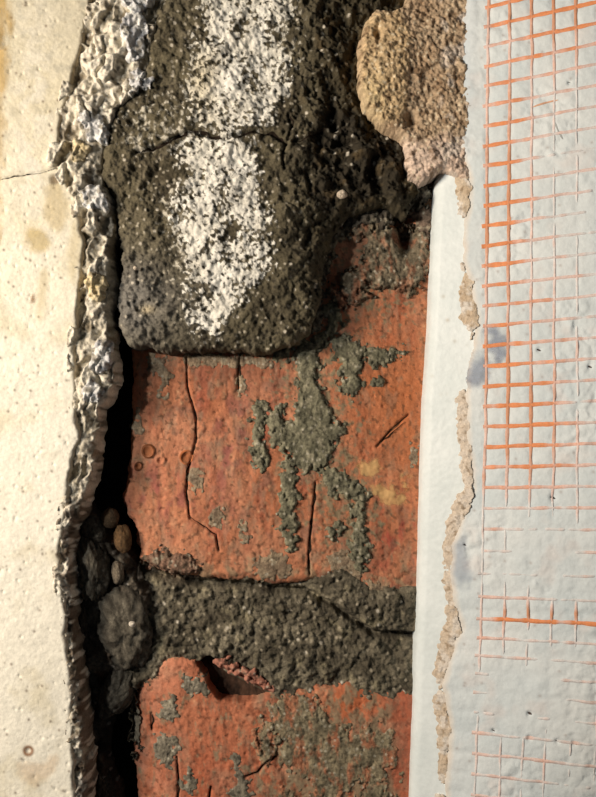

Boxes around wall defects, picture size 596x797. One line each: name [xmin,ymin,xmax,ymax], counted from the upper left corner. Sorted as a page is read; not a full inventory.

efflorescence [117,0,304,341]
peeling [455,177,473,218]
peeling [458,262,480,340]
spalling [46,0,166,797]
crack [186,367,219,550]
spalling [201,655,275,695]
peeling [432,389,474,784]